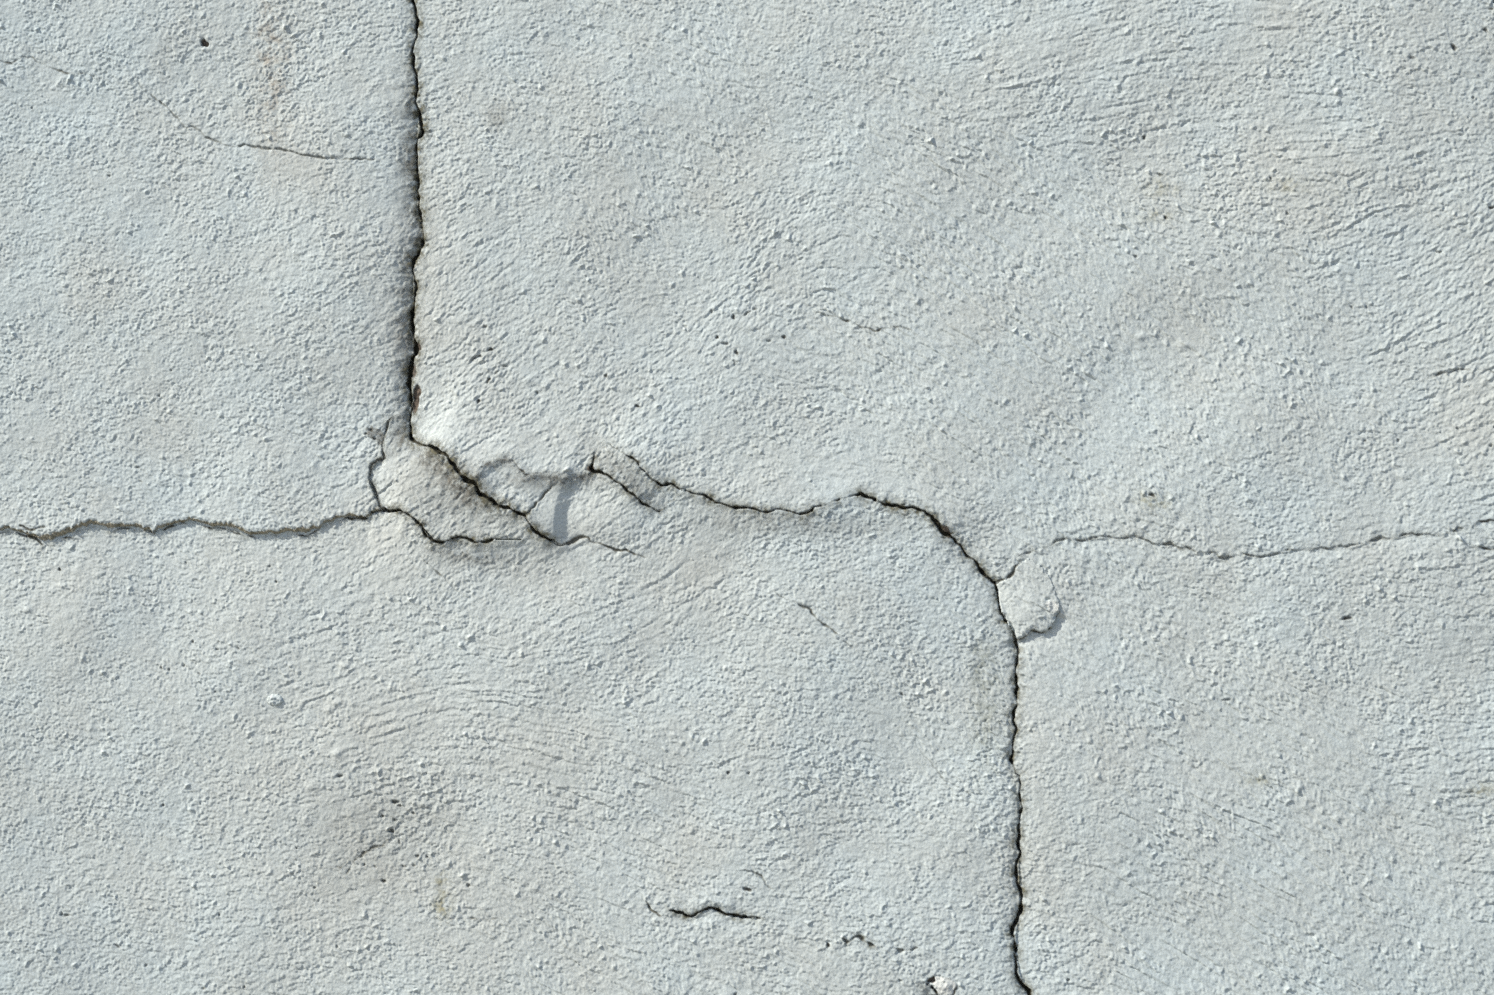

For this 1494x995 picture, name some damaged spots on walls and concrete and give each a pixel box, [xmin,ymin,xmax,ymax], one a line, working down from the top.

crack [370,0,1032,995]